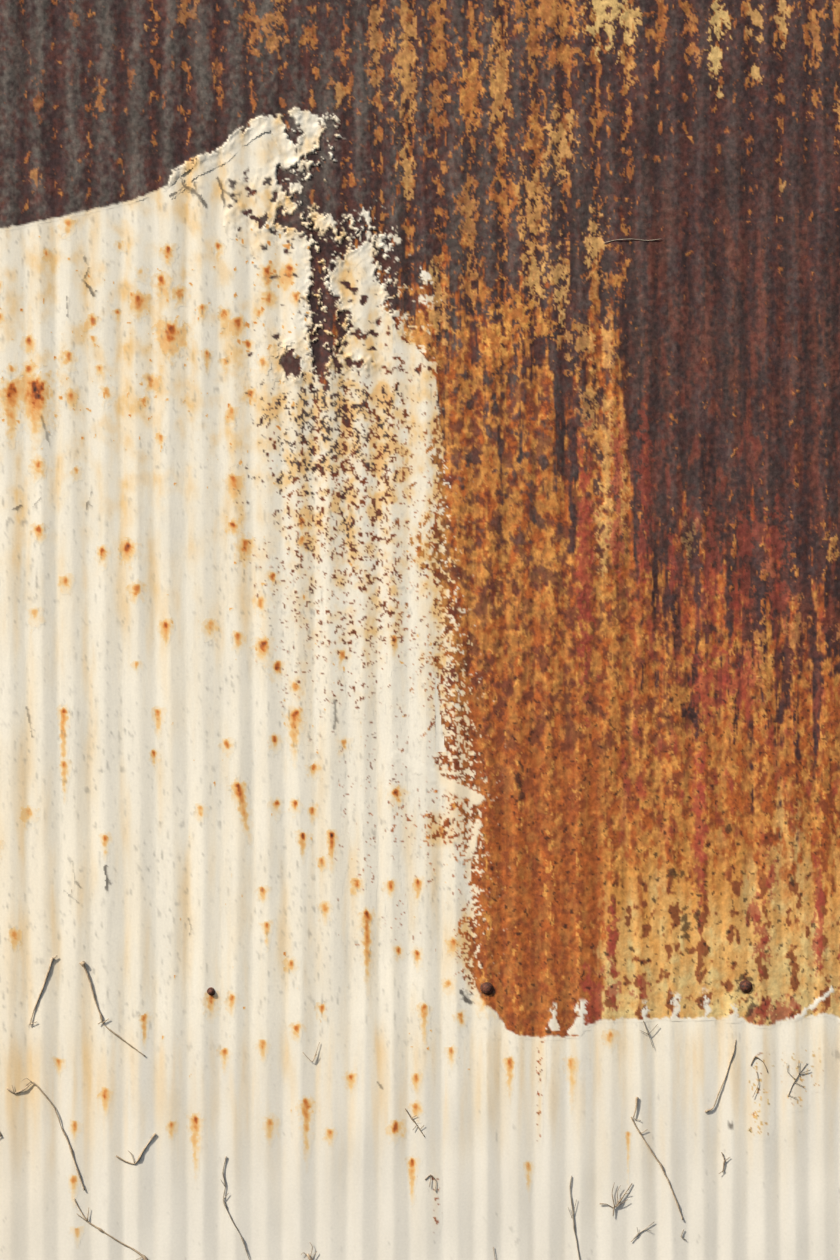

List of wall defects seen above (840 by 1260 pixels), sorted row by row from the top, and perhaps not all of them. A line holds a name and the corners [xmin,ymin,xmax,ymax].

corrosion [110,243,196,368]
corrosion [217,304,271,375]
corrosion [255,263,281,308]
corrosion [0,333,130,488]
corrosion [94,537,148,605]
corrosion [222,450,282,620]
peeling [190,113,489,1014]
corrosion [198,618,323,781]
corrosion [213,776,353,874]
corrosion [347,875,428,998]
peeling [602,830,840,1030]
corrosion [261,1093,338,1174]